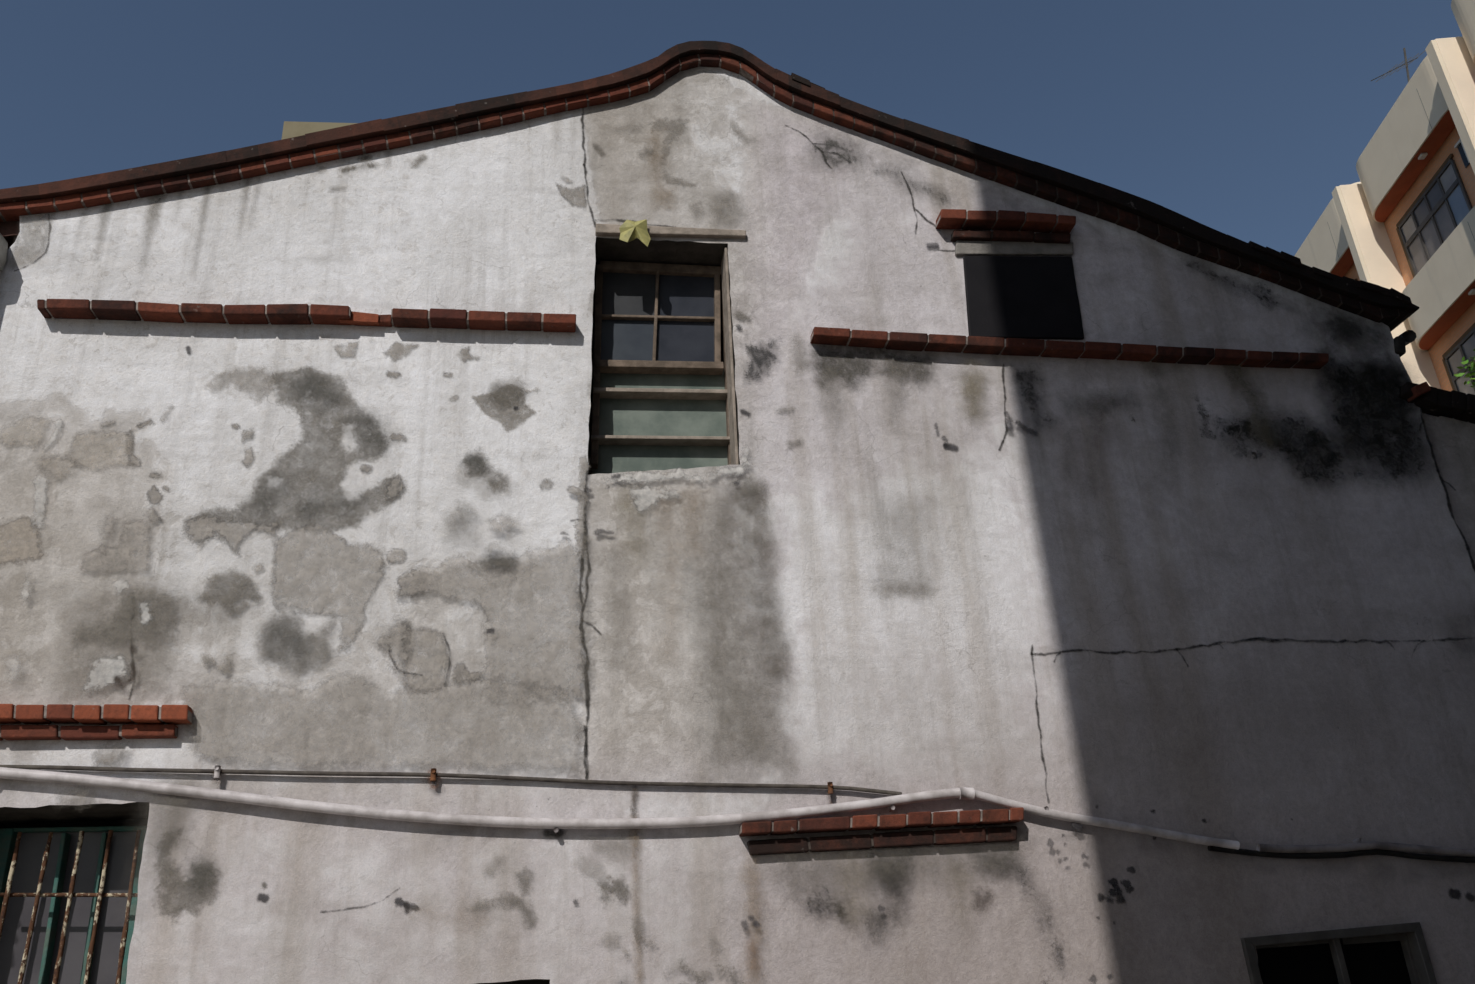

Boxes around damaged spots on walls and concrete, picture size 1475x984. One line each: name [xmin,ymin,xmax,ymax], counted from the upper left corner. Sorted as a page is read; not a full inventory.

crack [794,129,850,168]
crack [901,172,955,251]
crack [999,364,1008,450]
damp [1196,365,1423,482]
crack [1419,411,1475,571]
peeling [377,623,481,690]
crack [577,471,600,779]
crack [1031,637,1464,801]
spalling [1098,867,1135,903]
peeling [1449,889,1475,902]